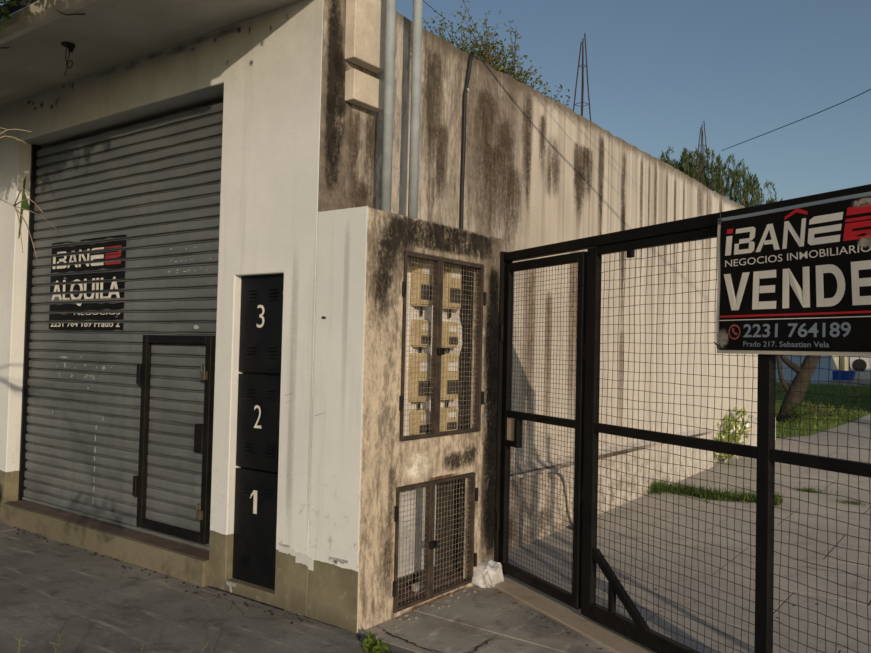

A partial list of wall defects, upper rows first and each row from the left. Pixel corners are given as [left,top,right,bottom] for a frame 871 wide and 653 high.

leakage [326,0,376,207]
leakage [426,52,448,196]
leakage [479,92,559,223]
leakage [574,140,604,235]
leakage [640,161,684,227]
leakage [486,270,499,550]
leakage [406,454,430,477]
leakage [445,448,476,470]
crack [201,586,444,653]